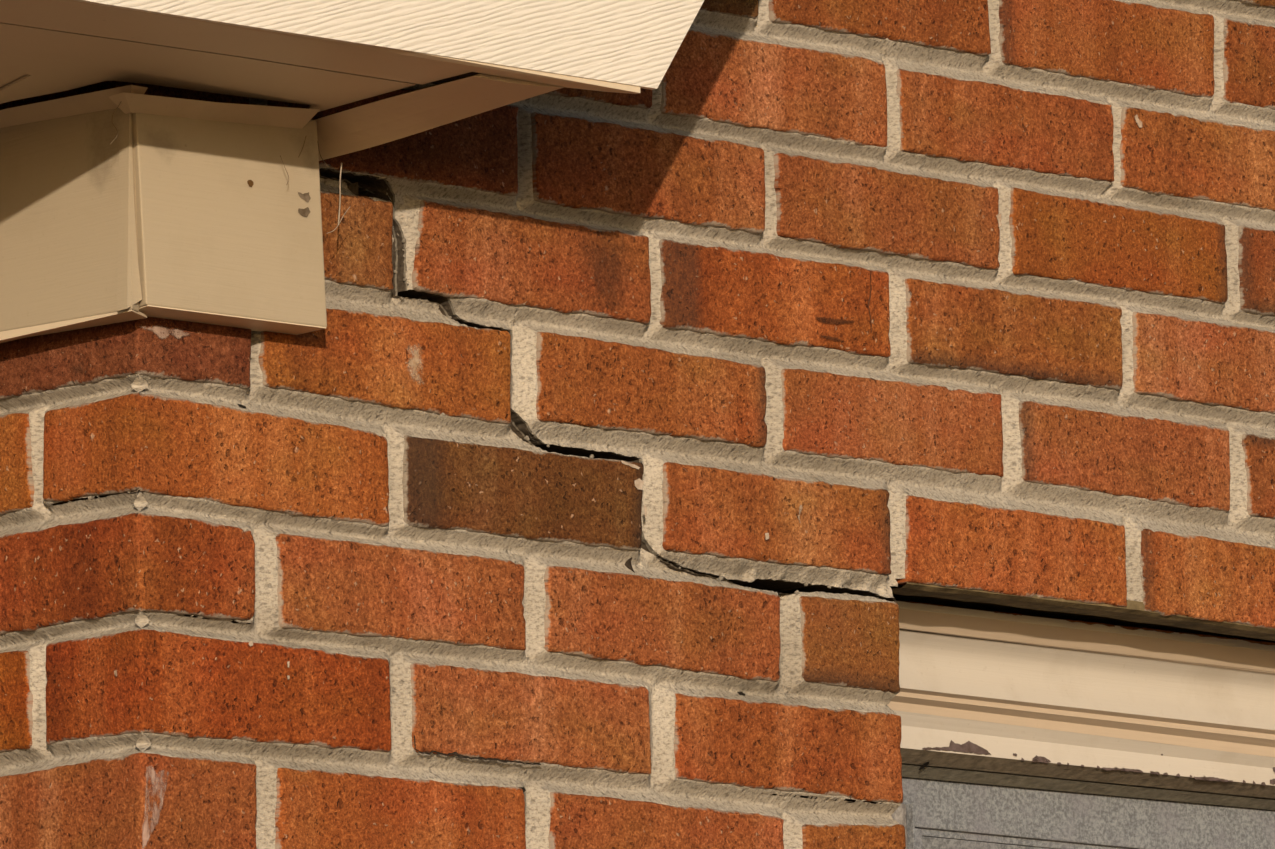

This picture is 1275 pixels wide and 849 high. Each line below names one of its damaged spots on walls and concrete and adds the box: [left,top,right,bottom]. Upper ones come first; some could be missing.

crack [319,168,641,463]
crack [866,271,874,333]
crack [625,501,897,603]
peeling [922,740,991,755]
peeling [1013,753,1275,786]